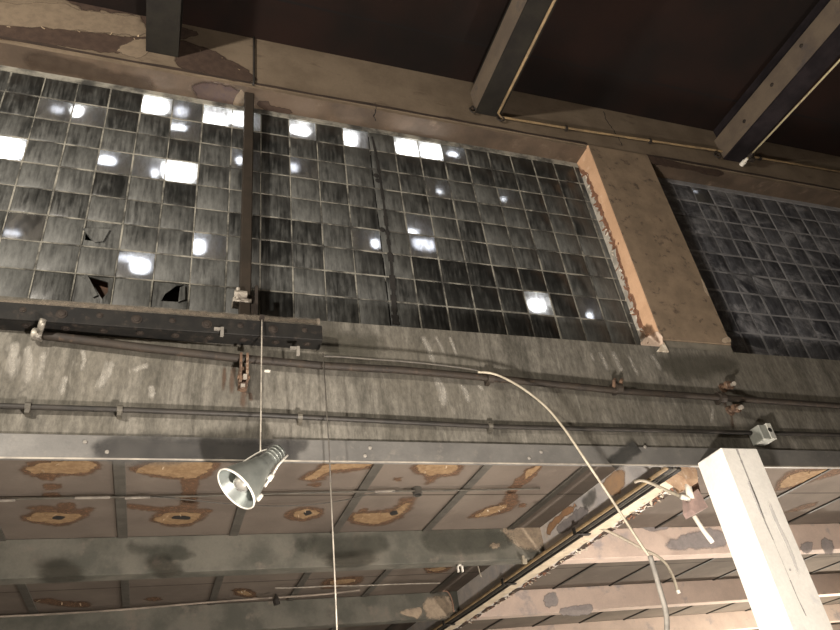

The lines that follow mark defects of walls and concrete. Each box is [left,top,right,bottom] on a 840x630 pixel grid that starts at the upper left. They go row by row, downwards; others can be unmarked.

peeling [0,0,148,58]
peeling [175,27,257,106]
peeling [21,435,306,527]
peeling [299,463,373,487]
peeling [410,464,464,484]
peeling [468,466,542,518]
peeling [603,470,625,496]
peeling [284,507,324,522]
peeling [347,497,416,526]
peeling [666,528,727,550]
peeling [453,487,675,630]